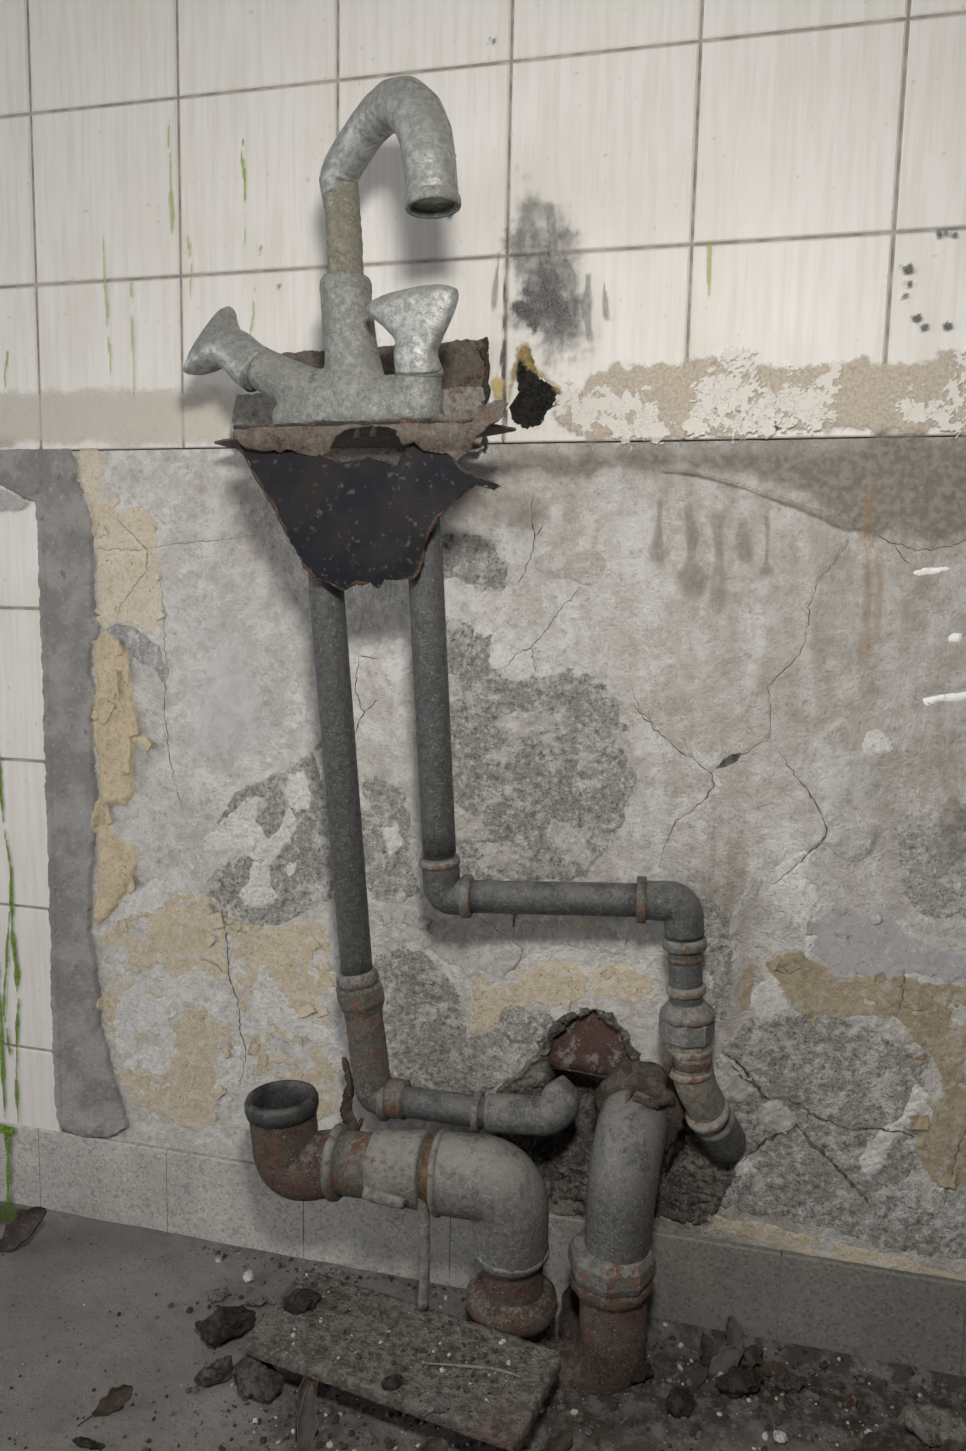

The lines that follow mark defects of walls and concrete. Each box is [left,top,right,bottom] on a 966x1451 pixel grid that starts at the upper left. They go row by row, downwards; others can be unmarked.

leakage [492,199,608,423]
spalling [76,448,340,1129]
spalling [442,530,510,592]
crack [518,500,543,583]
crack [504,590,578,692]
spalling [446,616,637,882]
leakage [515,346,966,538]
crack [632,533,966,886]
spalling [358,775,653,1216]
spalling [654,851,966,1281]
crack [722,1051,913,1203]
crack [944,1126,966,1204]